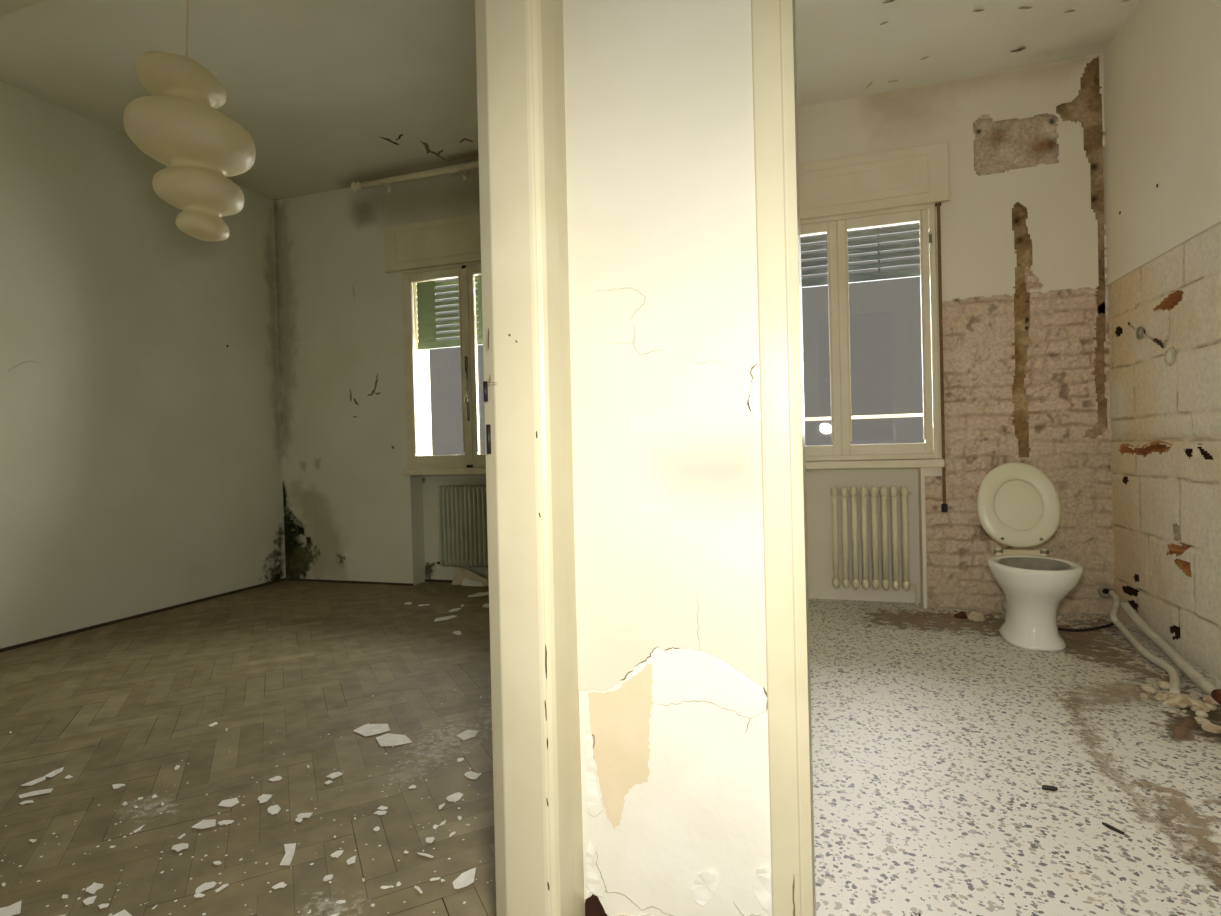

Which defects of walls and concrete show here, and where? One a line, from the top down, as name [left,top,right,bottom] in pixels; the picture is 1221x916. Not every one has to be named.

spalling [973,113,1059,176]
crack [596,287,757,395]
flaking render [925,223,1221,679]
damp [265,483,320,582]
peeling [579,646,772,916]